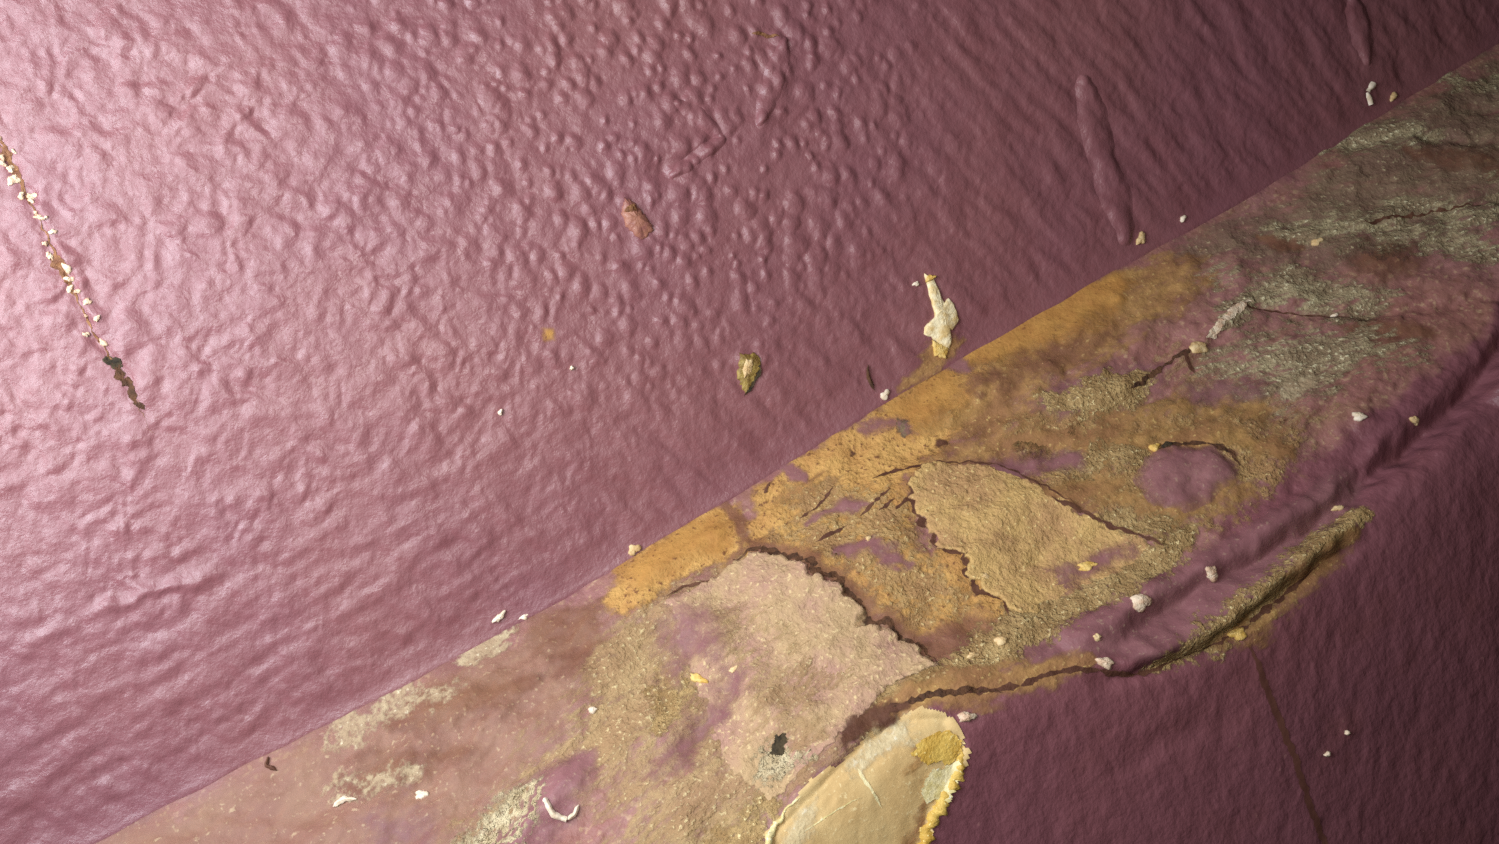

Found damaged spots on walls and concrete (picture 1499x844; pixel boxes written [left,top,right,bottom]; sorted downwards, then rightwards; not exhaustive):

crack [0,136,153,433]
peeling [737,352,761,396]
peeling [912,274,970,372]
crack [667,580,709,596]
peeling [664,540,972,844]
peeling [907,439,1149,618]
crack [870,564,1319,721]
crack [1052,496,1165,547]